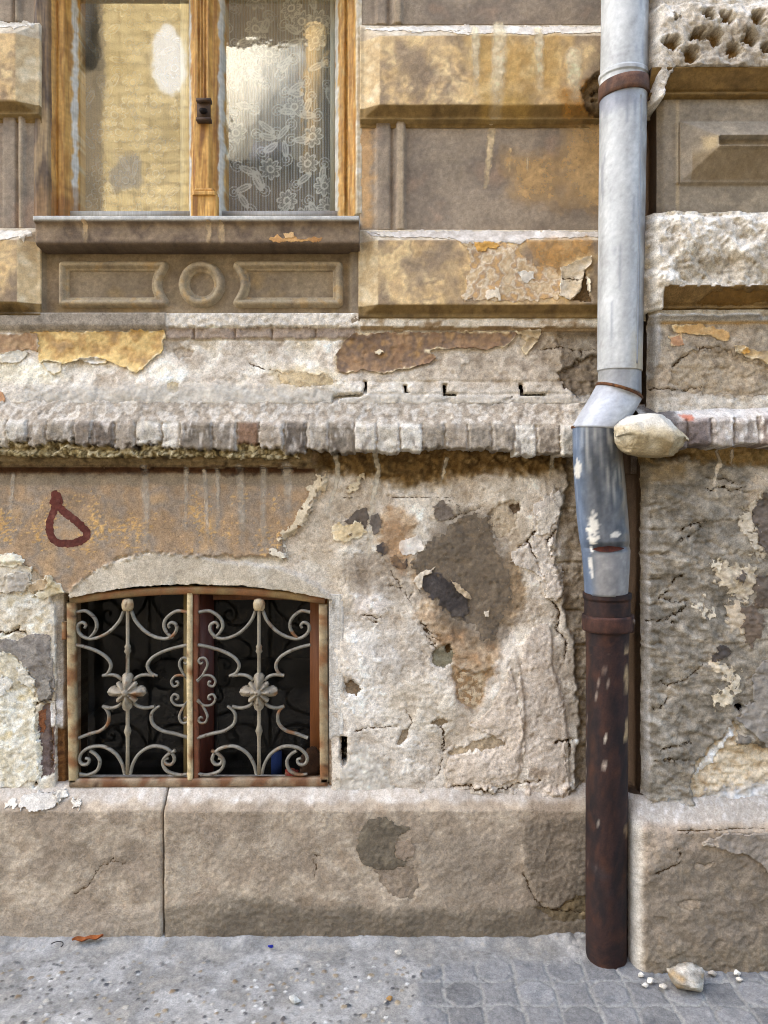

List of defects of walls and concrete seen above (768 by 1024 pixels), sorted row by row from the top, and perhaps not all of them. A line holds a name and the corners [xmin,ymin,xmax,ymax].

water stain [492,23,506,91]
water stain [534,28,543,69]
water stain [567,48,580,83]
water stain [486,124,495,175]
flaking render [366,229,598,303]
peeling [0,329,193,375]
flaking render [332,487,564,641]
crack [645,574,687,624]
peeling [690,492,768,649]
flaking render [0,651,82,812]
flaking render [517,623,570,798]
crack [522,874,585,913]